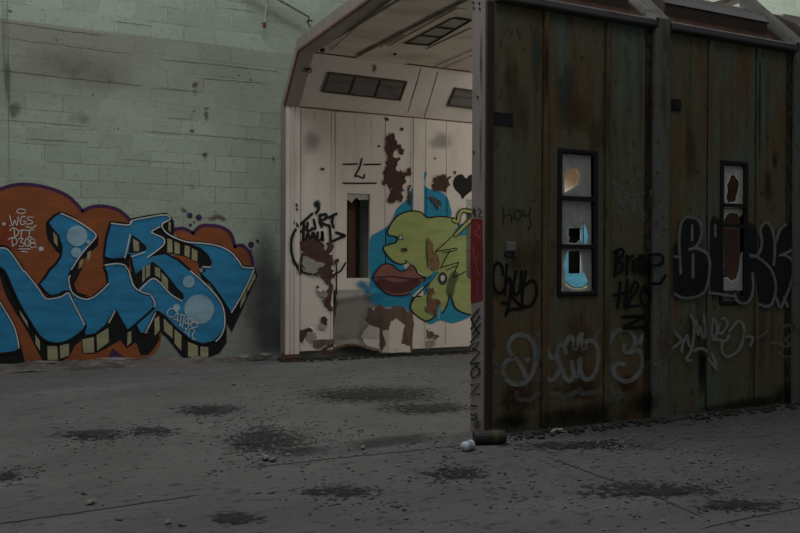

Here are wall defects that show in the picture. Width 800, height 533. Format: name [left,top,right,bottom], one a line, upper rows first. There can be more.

peeling [378,128,412,205]
peeling [427,171,456,210]
peeling [298,239,339,356]
peeling [361,304,414,353]